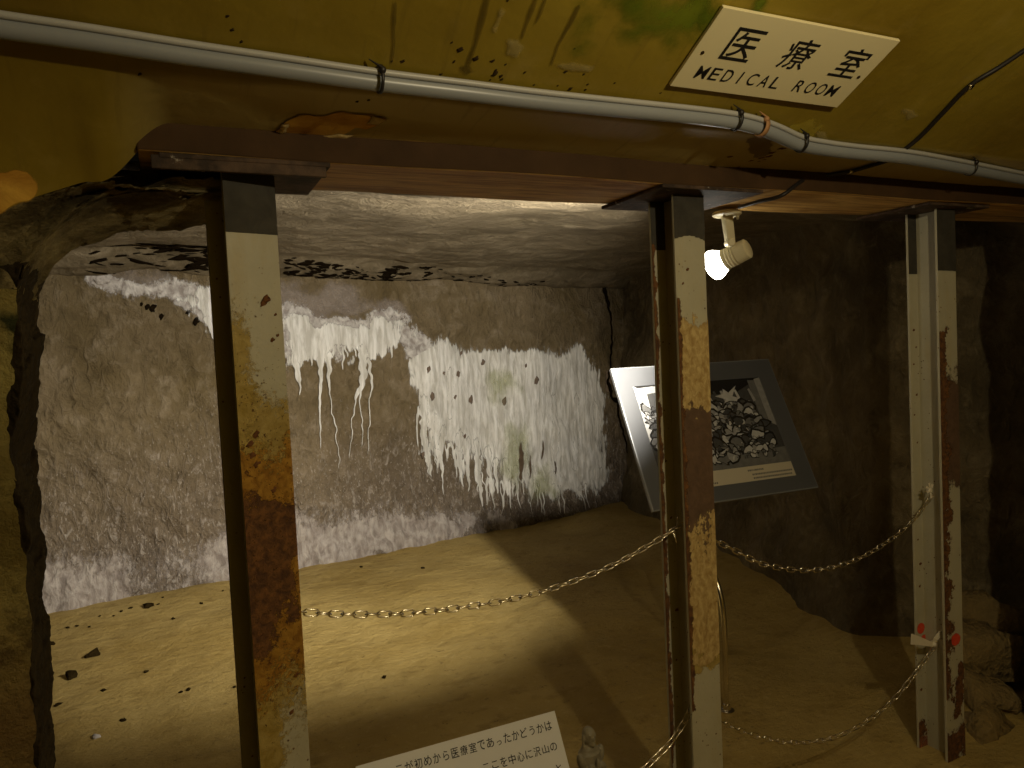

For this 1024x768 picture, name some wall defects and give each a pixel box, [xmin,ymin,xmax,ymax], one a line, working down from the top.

peeling [276,99,387,139]
water stain [42,550,146,614]
water stain [85,274,213,339]
water stain [157,532,229,588]
corrosion [232,309,308,768]
water stain [281,288,609,569]
corrosion [652,244,675,768]
corrosion [677,298,720,723]
corrosion [939,326,960,703]